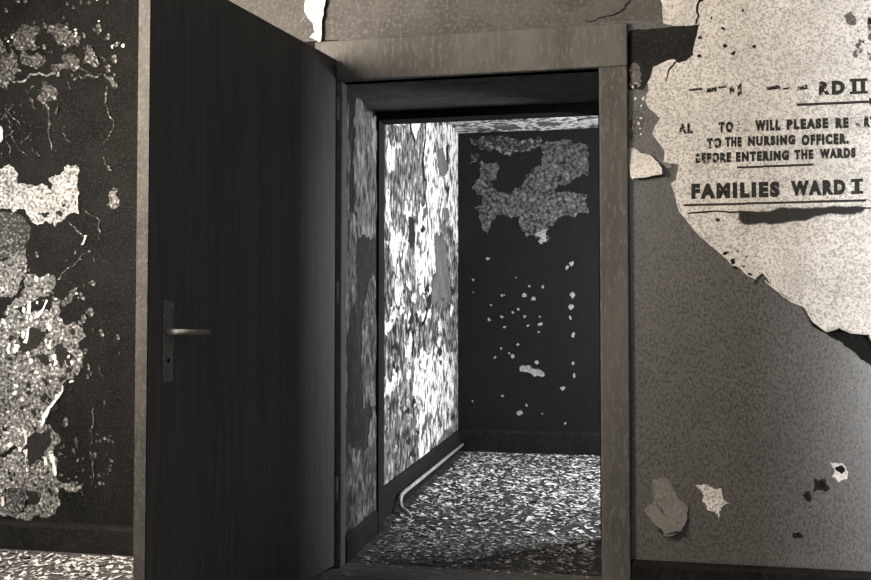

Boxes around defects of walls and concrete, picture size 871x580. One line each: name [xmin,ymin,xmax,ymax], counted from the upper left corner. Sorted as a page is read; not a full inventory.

peeling [0,16,125,84]
peeling [300,0,326,42]
crack [695,0,703,24]
peeling [0,81,65,158]
peeling [0,164,80,226]
peeling [464,117,589,244]
crack [688,208,750,216]
peeling [628,0,871,365]
peeling [345,97,458,531]
peeling [0,249,113,521]
peeling [519,360,545,377]
peeling [695,484,729,518]